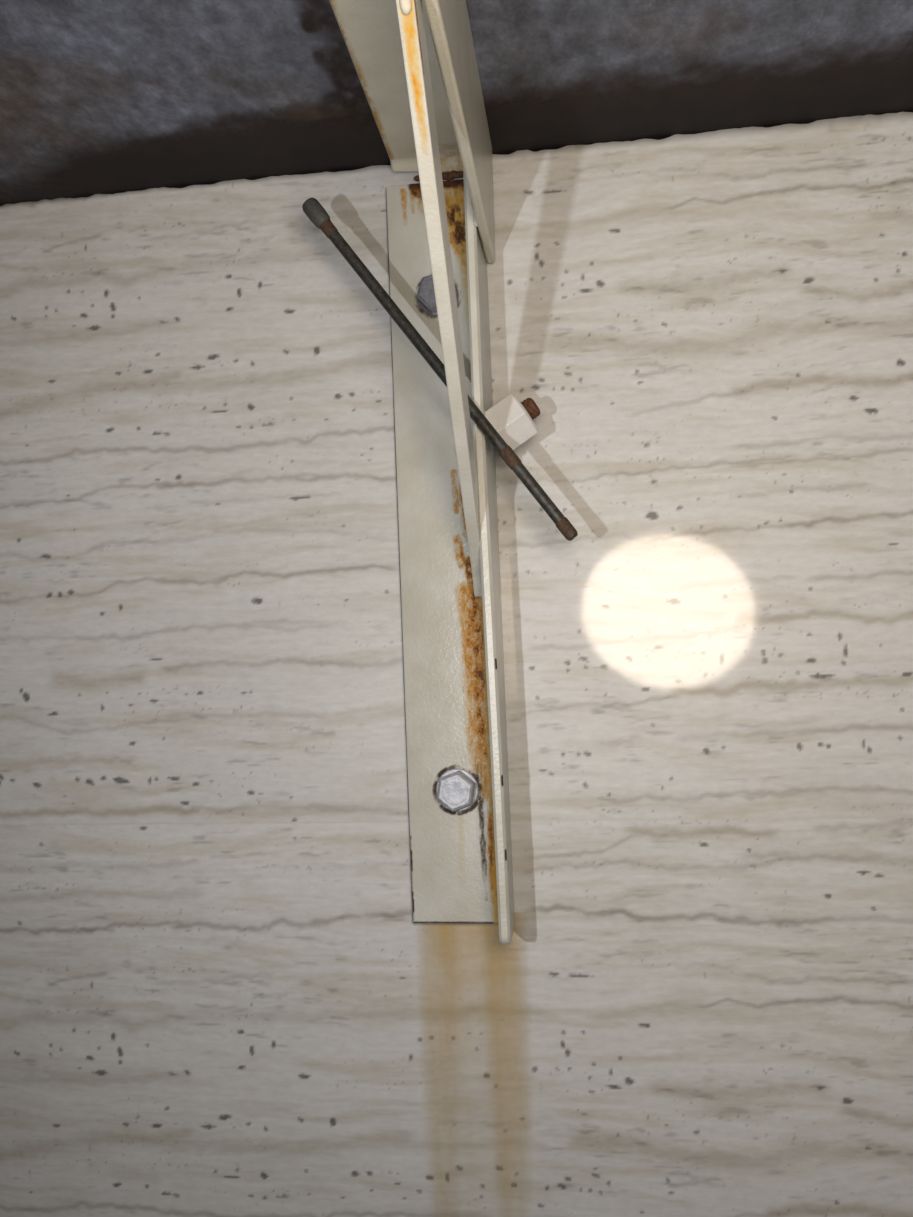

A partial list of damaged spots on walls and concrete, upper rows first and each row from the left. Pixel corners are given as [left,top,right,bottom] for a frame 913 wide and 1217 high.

rust [401,183,422,218]
rust [440,155,472,287]
rust [451,470,498,930]